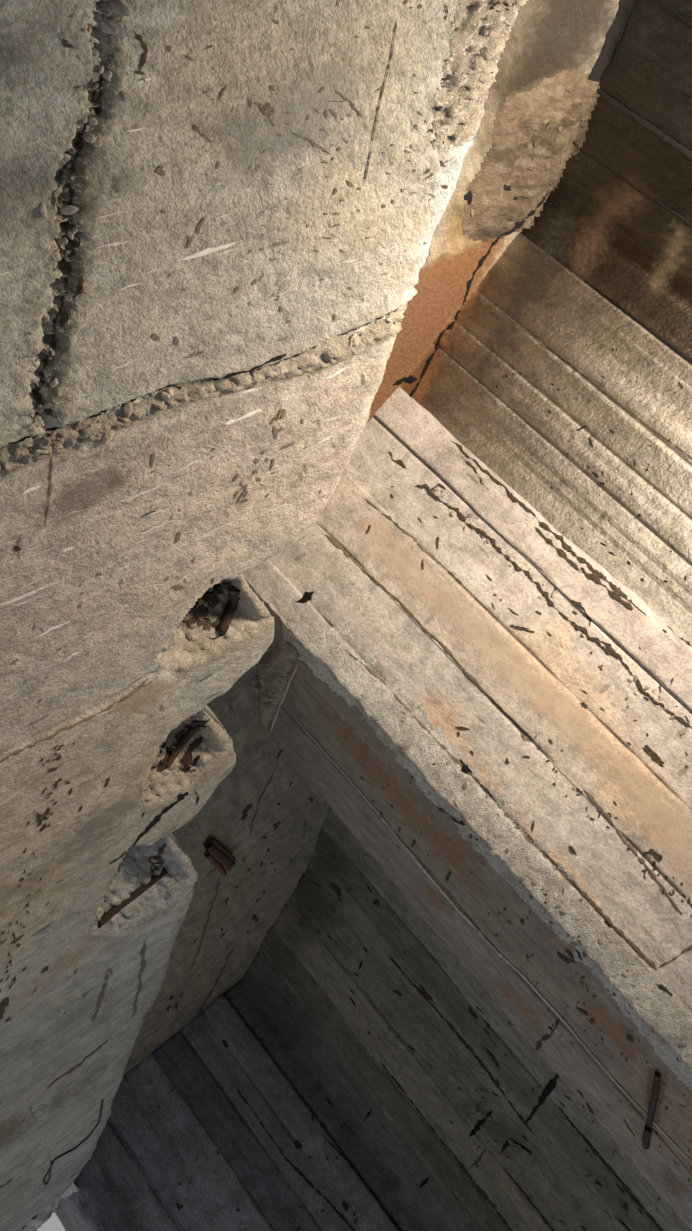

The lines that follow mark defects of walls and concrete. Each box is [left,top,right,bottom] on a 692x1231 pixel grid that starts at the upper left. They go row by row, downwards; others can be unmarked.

crack [0,0,403,463]
spalling [0,306,407,482]
rust [370,238,502,420]
crack [389,441,692,738]
spalling [140,714,235,813]
spalling [89,835,197,941]
rust [203,835,236,876]
spalling [159,576,692,1150]
spalling [20,1181,79,1231]
crack [468,1074,559,1170]